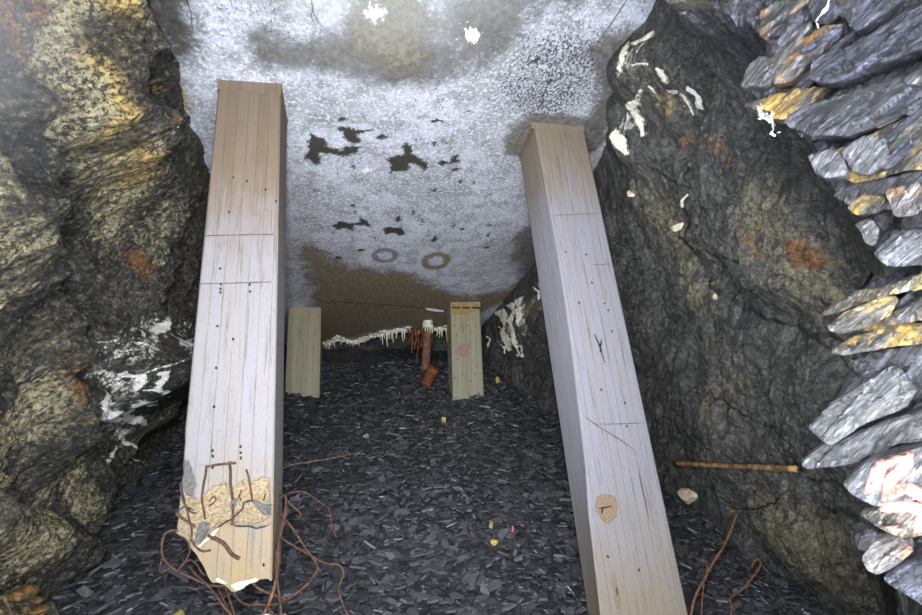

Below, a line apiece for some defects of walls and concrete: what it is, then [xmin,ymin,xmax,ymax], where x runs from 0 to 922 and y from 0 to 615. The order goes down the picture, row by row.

leakage [249,0,553,85]
peeling [304,117,388,170]
peeling [387,142,476,184]
peeling [331,204,424,239]
leakage [510,228,536,274]
leakage [300,246,524,358]
corrosion [405,327,434,359]
spalling [283,448,349,469]
spalling [159,460,349,615]